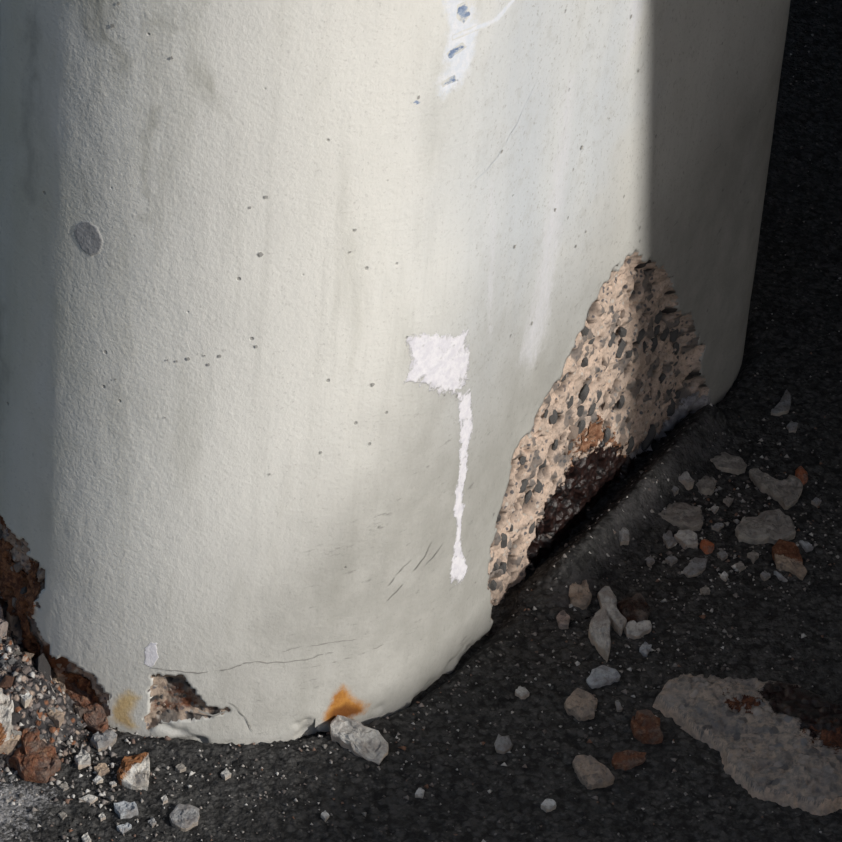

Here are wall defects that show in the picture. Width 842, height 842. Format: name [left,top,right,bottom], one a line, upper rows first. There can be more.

spalling [487,252,711,605]
corrosion [527,414,659,570]
peeling [658,471,733,578]
peeling [717,468,814,582]
corrosion [0,538,49,661]
spalling [0,516,150,791]
spalling [143,641,230,730]
crack [154,639,384,674]
corrosion [315,679,377,732]
peeling [78,794,98,806]
peeling [114,801,139,834]